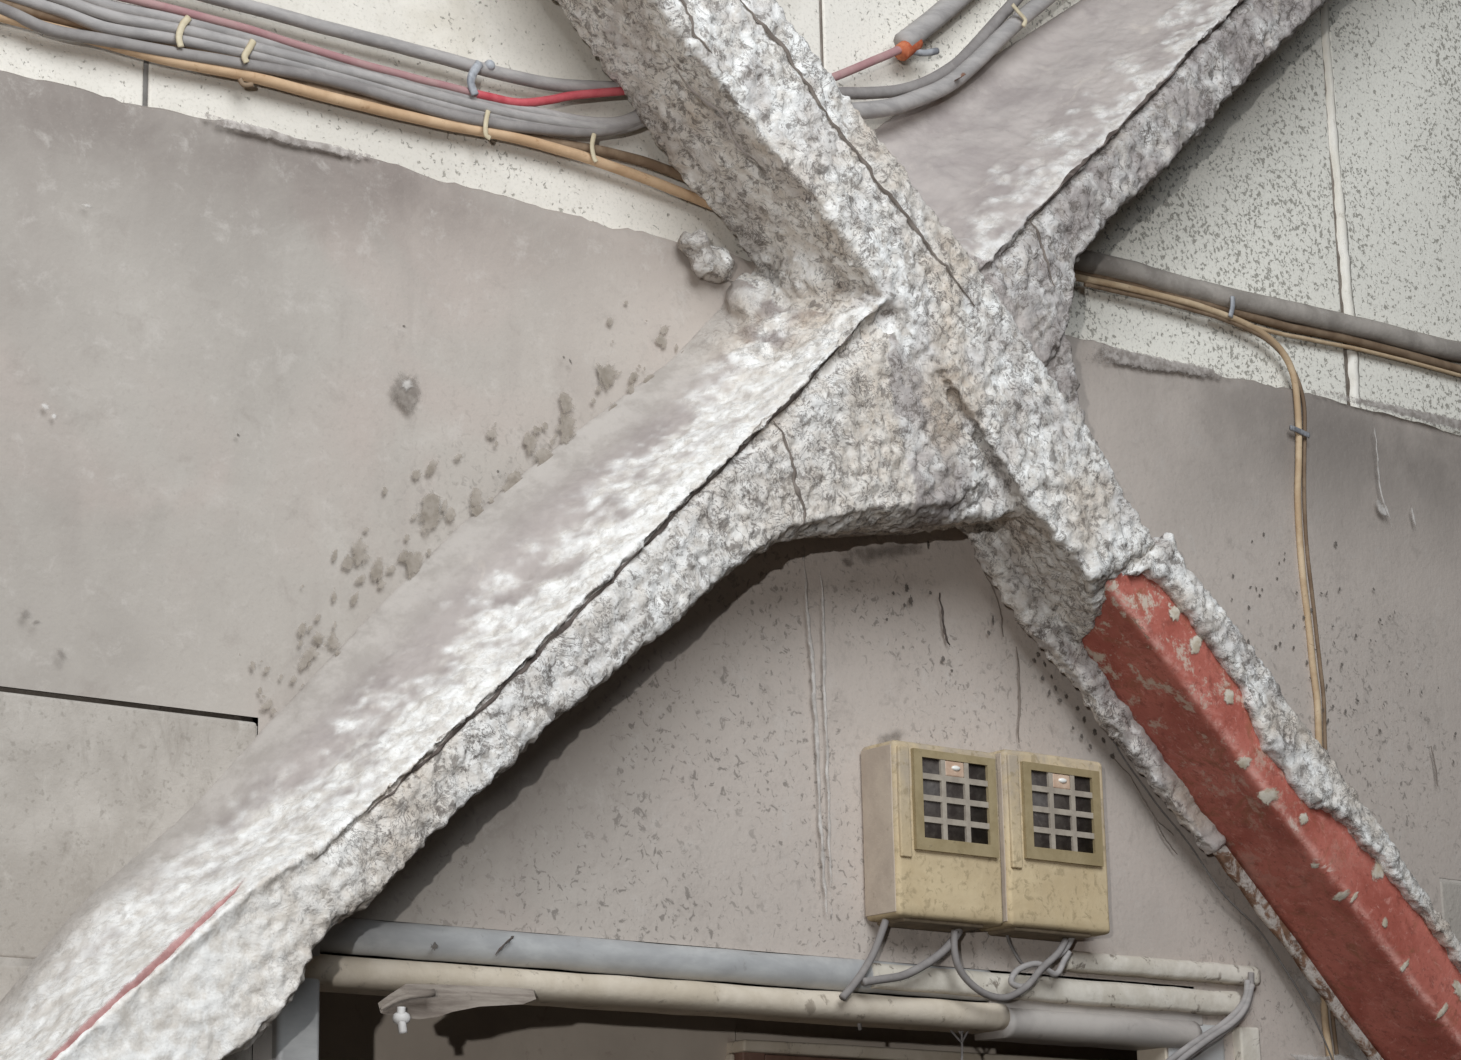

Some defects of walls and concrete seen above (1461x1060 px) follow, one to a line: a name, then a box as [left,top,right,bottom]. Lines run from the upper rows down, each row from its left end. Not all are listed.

crack [368,322,861,812]
peeling [1169,606,1180,621]
peeling [1190,635,1203,654]
peeling [1224,689,1234,704]
peeling [1234,756,1252,769]
peeling [1258,788,1279,805]
peeling [1372,860,1384,879]
peeling [1332,889,1358,902]
peeling [1436,980,1461,1019]